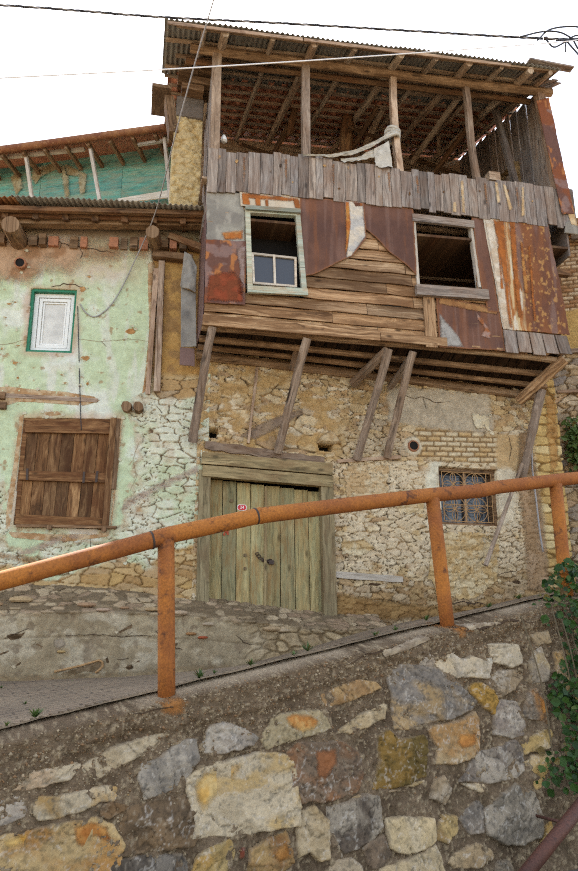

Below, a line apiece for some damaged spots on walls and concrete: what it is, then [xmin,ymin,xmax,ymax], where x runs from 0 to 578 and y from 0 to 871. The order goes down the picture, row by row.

corrosion [208,231,245,301]
corrosion [439,220,536,338]